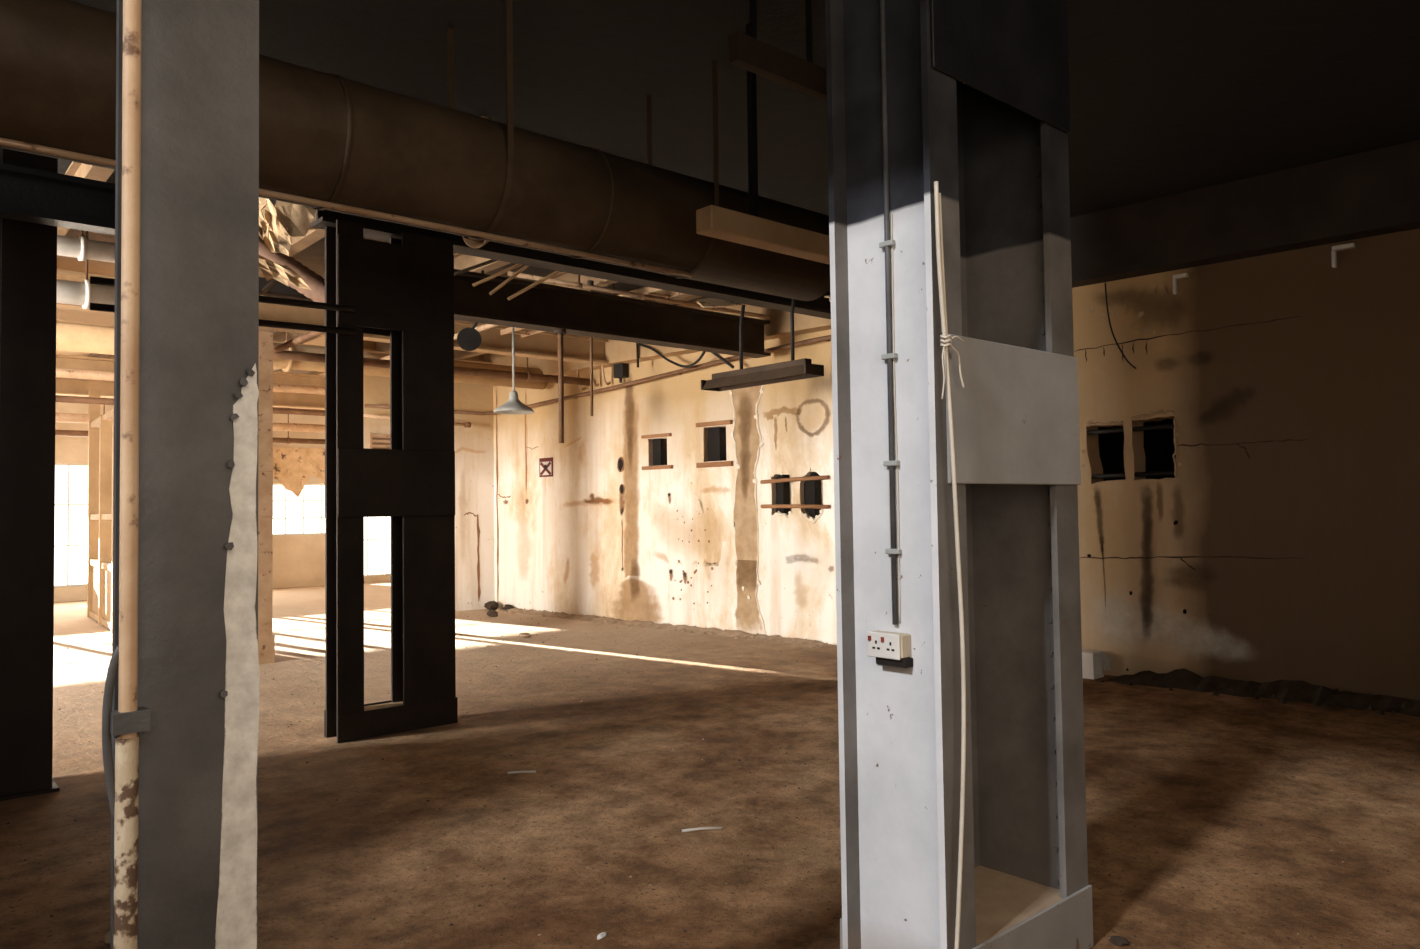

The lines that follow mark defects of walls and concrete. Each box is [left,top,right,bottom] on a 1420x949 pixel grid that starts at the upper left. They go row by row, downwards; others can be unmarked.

water stain [562,364,732,624]
water stain [1080,488,1272,669]